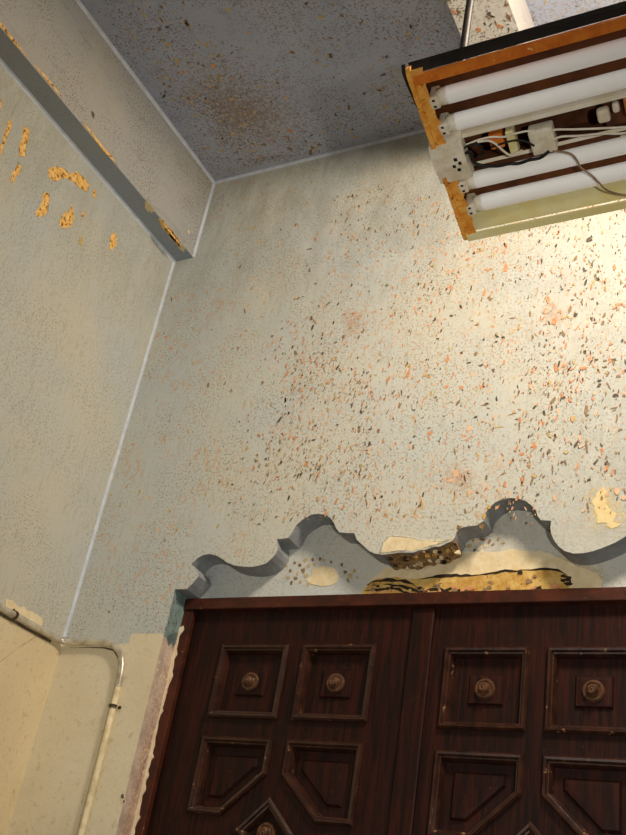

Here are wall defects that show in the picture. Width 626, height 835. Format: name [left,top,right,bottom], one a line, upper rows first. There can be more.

peeling [0,119,12,155]
peeling [9,125,30,185]
peeling [46,166,97,199]
peeling [35,191,50,219]
peeling [58,206,87,229]
peeling [145,201,185,252]
flaking render [198,184,626,594]